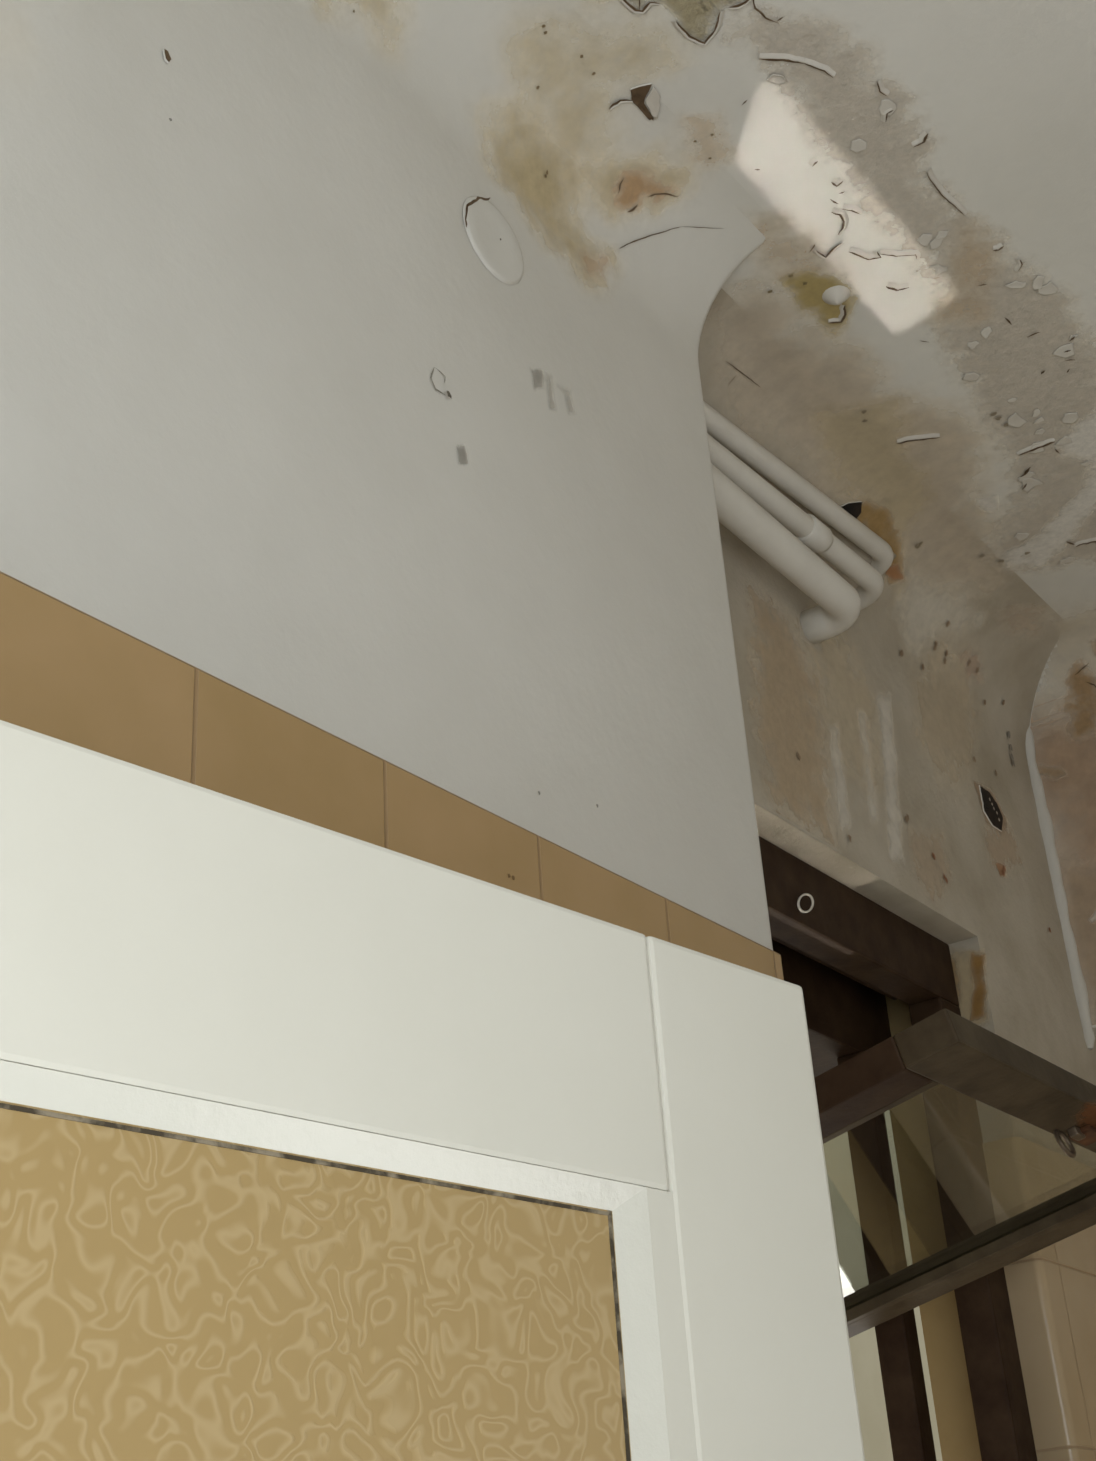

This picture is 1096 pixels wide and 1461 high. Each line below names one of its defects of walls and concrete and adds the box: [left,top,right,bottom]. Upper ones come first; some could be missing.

peeling [618,0,1096,570]
water stain [748,587,946,895]
flaking render [840,501,904,584]
water stain [726,293,1096,779]
flaking render [974,782,1007,833]
water stain [1030,615,1096,1025]